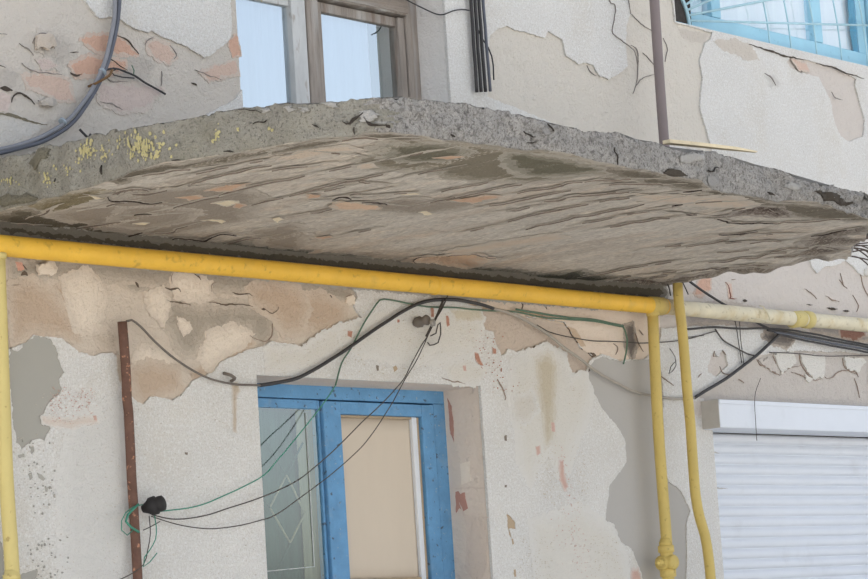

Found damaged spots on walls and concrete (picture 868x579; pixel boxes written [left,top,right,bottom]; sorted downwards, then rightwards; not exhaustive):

flaking render [0,0,241,158]
crack [609,0,668,93]
crack [749,44,864,79]
flaking render [787,58,864,141]
crack [76,112,407,245]
crack [410,147,847,299]
spalling [814,190,853,206]
flaking render [68,283,200,400]
crack [165,274,279,342]
flaking render [613,228,868,318]
flaking render [699,327,868,406]
peeling [8,331,64,515]